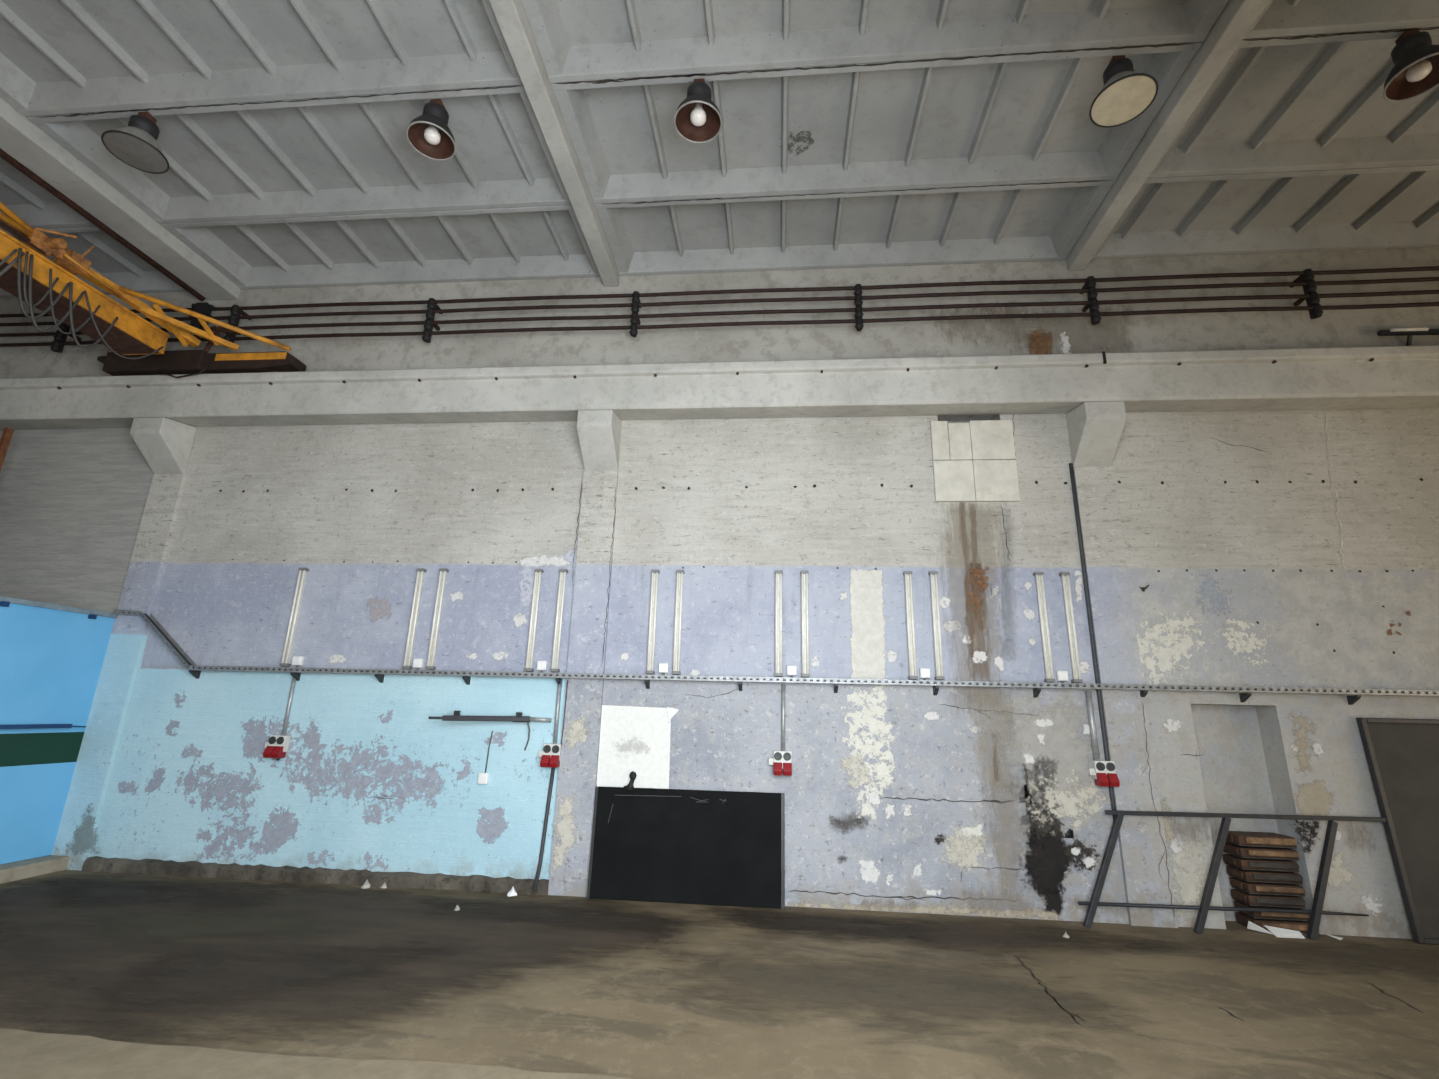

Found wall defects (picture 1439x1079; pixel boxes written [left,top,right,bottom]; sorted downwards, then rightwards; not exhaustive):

rust [965,565,989,614]
peeling [1136,569,1278,693]
peeling [118,691,471,863]
peeling [477,806,509,844]
peeling [484,732,507,748]
peeling [837,684,912,821]
crack [1141,700,1174,912]
peeling [1163,719,1181,734]